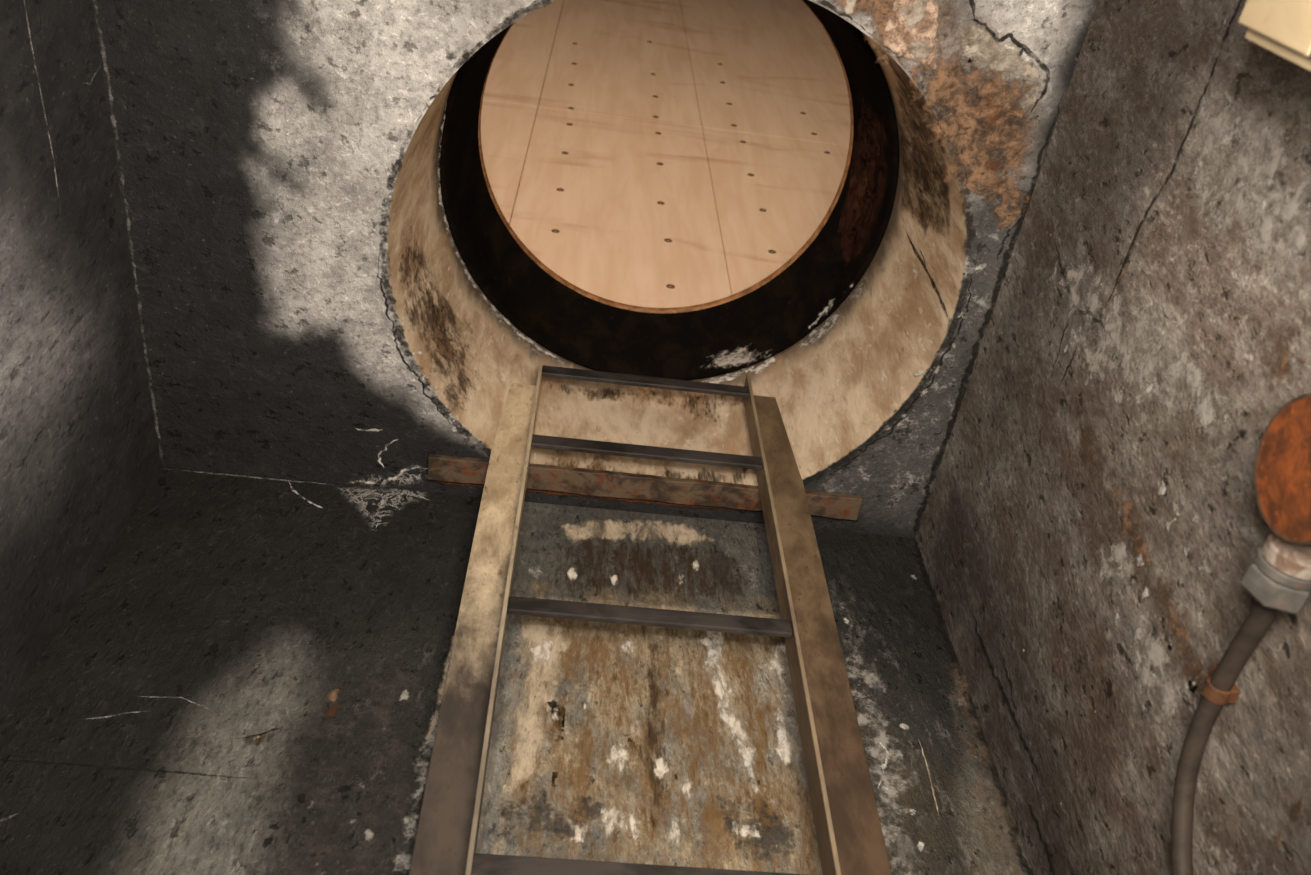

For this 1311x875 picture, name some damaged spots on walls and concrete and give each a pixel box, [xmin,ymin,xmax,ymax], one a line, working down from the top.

corrosion [837,0,898,59]
crack [95,6,162,457]
corrosion [838,104,887,262]
corrosion [910,55,1035,229]
crack [1053,0,1242,385]
crack [526,489,752,511]
crack [907,0,1064,875]